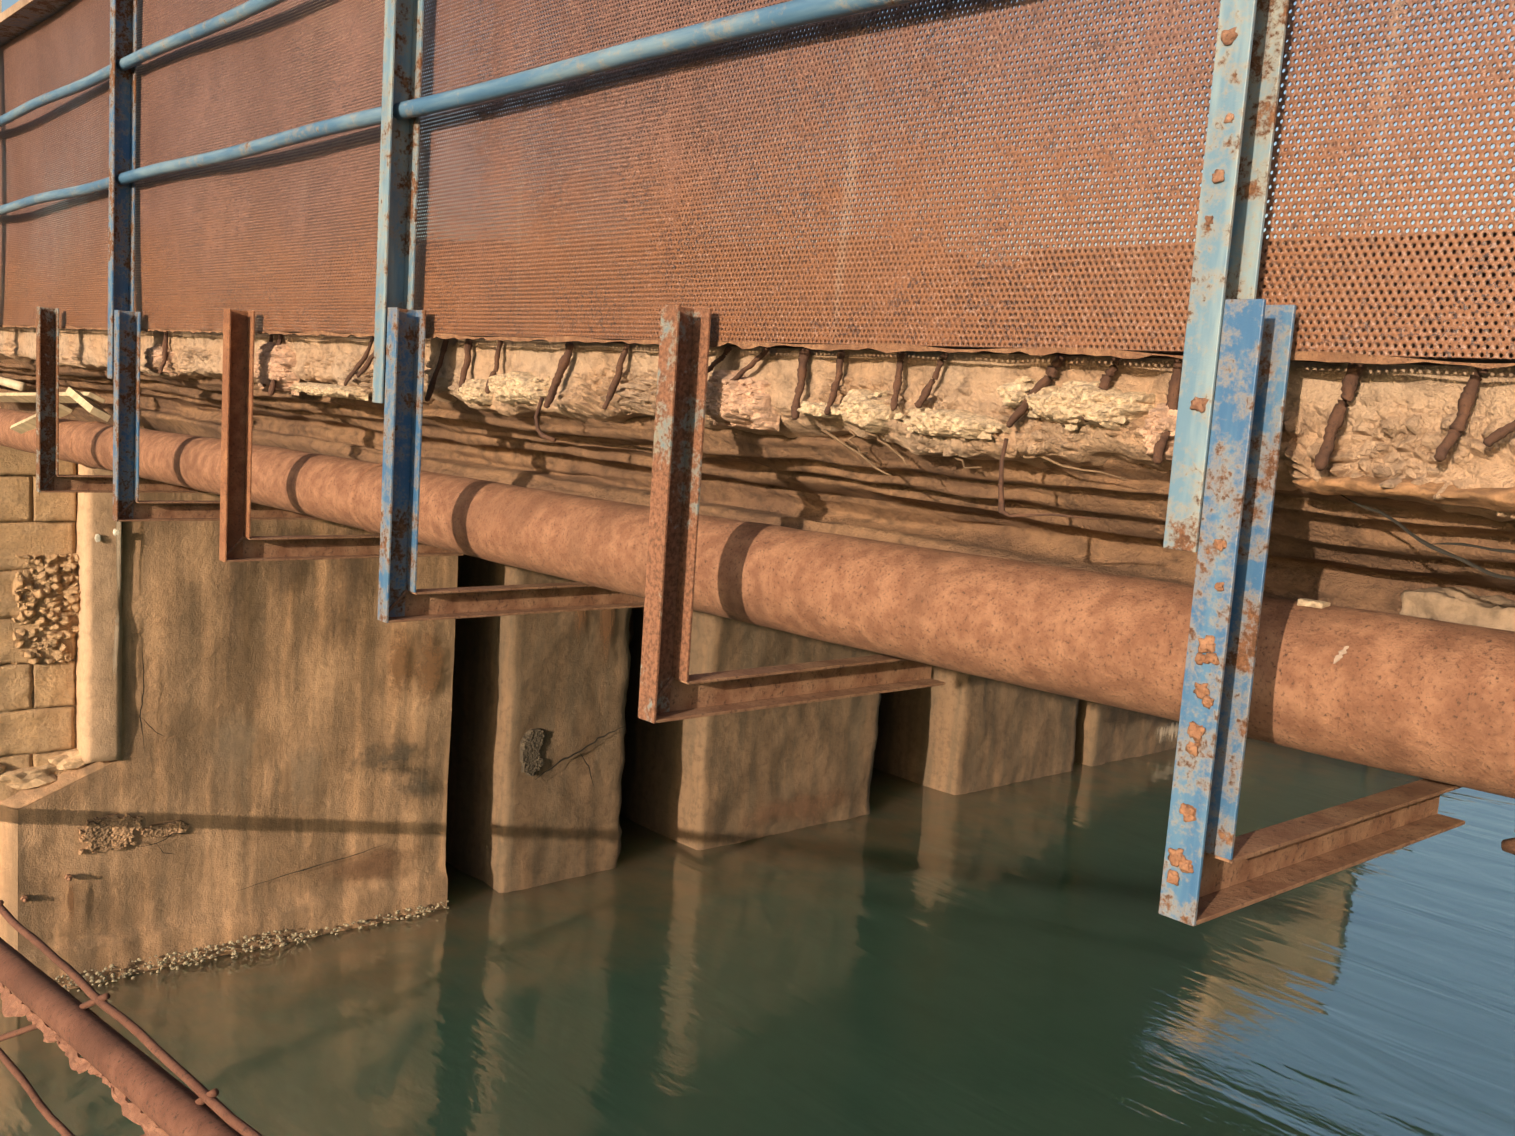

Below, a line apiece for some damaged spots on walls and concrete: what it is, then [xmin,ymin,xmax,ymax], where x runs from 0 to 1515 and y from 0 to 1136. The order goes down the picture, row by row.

spalling [254,334,374,401]
spalling [424,339,574,408]
spalling [602,344,630,410]
spalling [705,346,1183,464]
spalling [1314,363,1364,471]
spalling [1434,367,1489,462]
spalling [1483,420,1515,447]
spalling [11,553,81,665]
crack [535,726,626,786]
spalling [78,813,189,855]